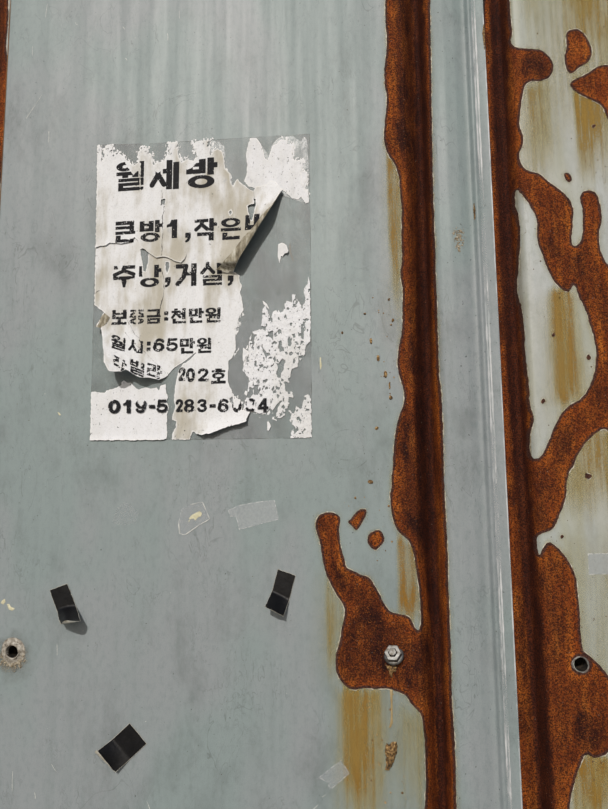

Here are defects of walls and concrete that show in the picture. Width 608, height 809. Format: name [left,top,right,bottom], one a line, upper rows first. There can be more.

rust [0,0,11,204]
rust [315,0,457,809]
rust [483,0,608,809]